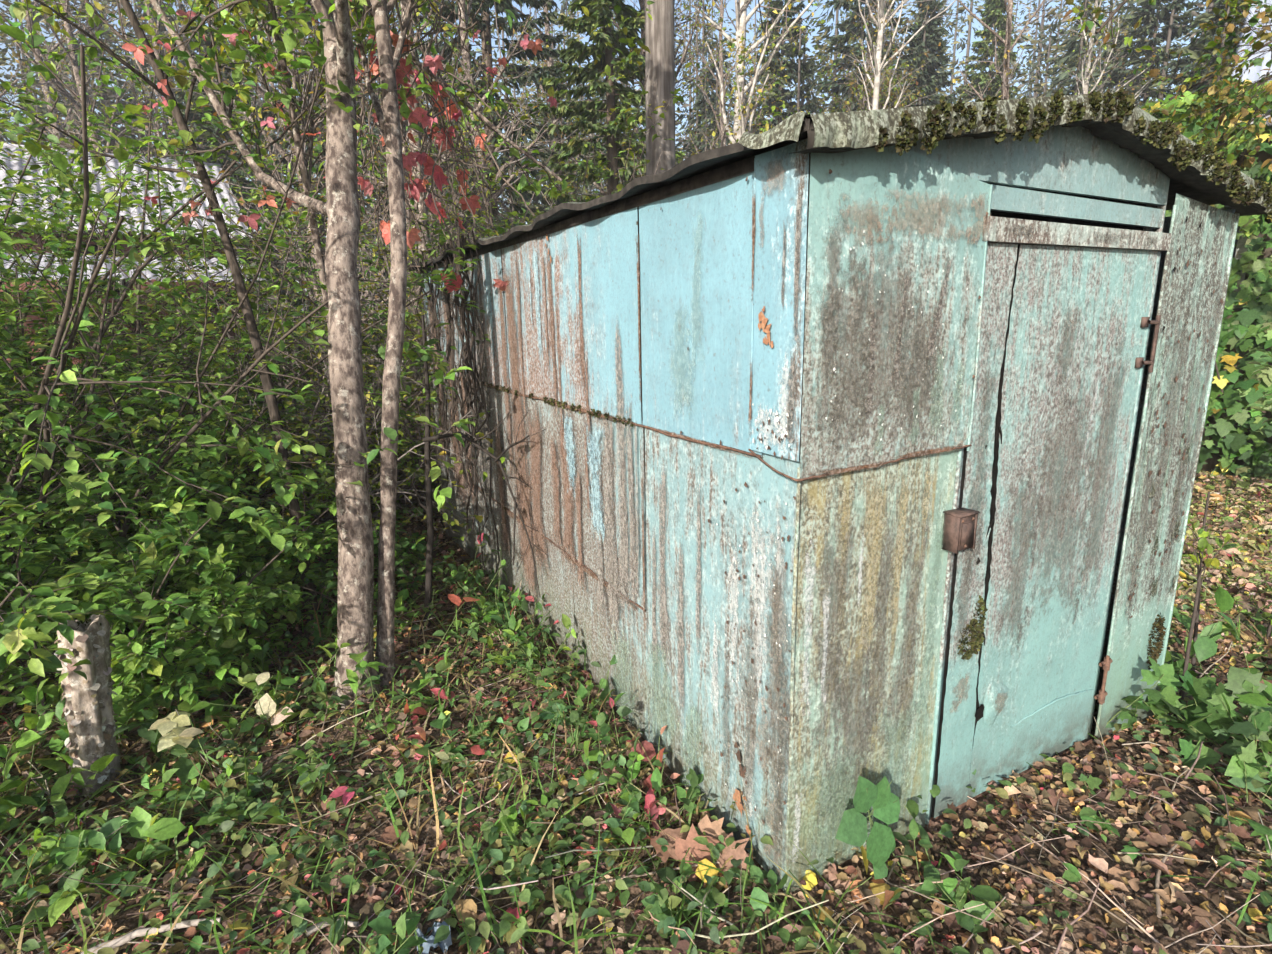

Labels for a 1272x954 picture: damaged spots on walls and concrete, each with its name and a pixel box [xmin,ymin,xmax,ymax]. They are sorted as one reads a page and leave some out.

rust [752,196,774,348]
leakage [927,257,953,358]
rust [427,234,646,646]
rust [651,364,793,460]
peeling [752,404,793,450]
leakage [837,489,852,617]
rust [733,789,751,836]